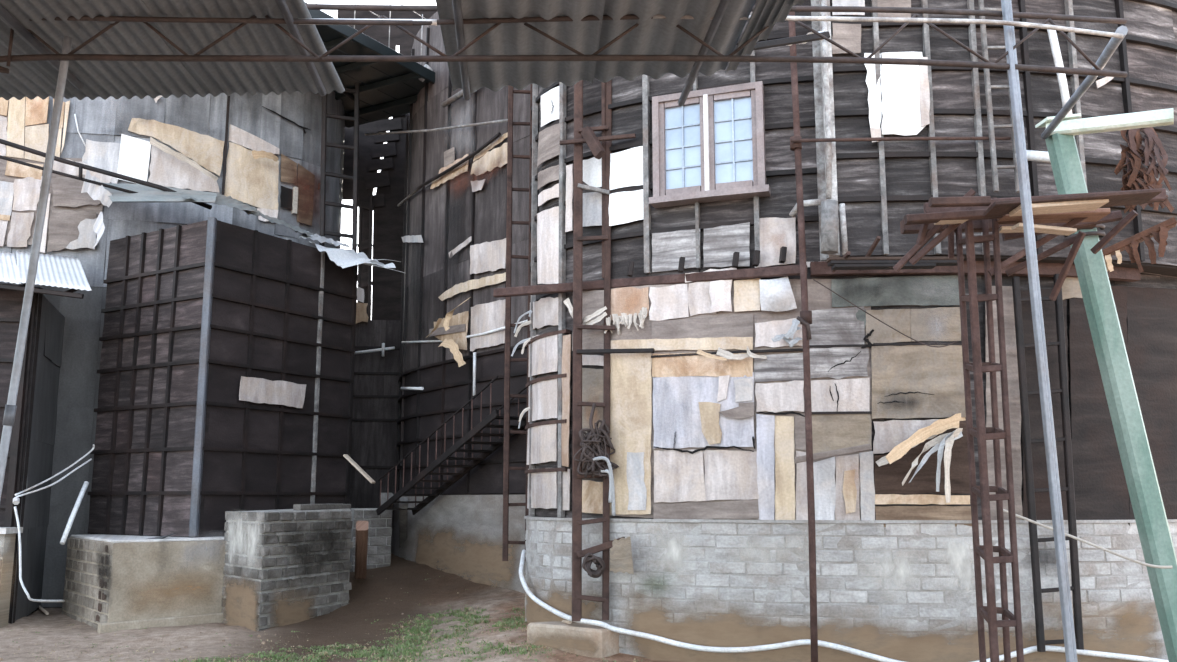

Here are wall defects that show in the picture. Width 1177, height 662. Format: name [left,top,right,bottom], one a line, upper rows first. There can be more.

peeling [563,298,647,335]
crack [828,329,874,412]
crack [654,411,805,454]
peeling [876,413,966,503]